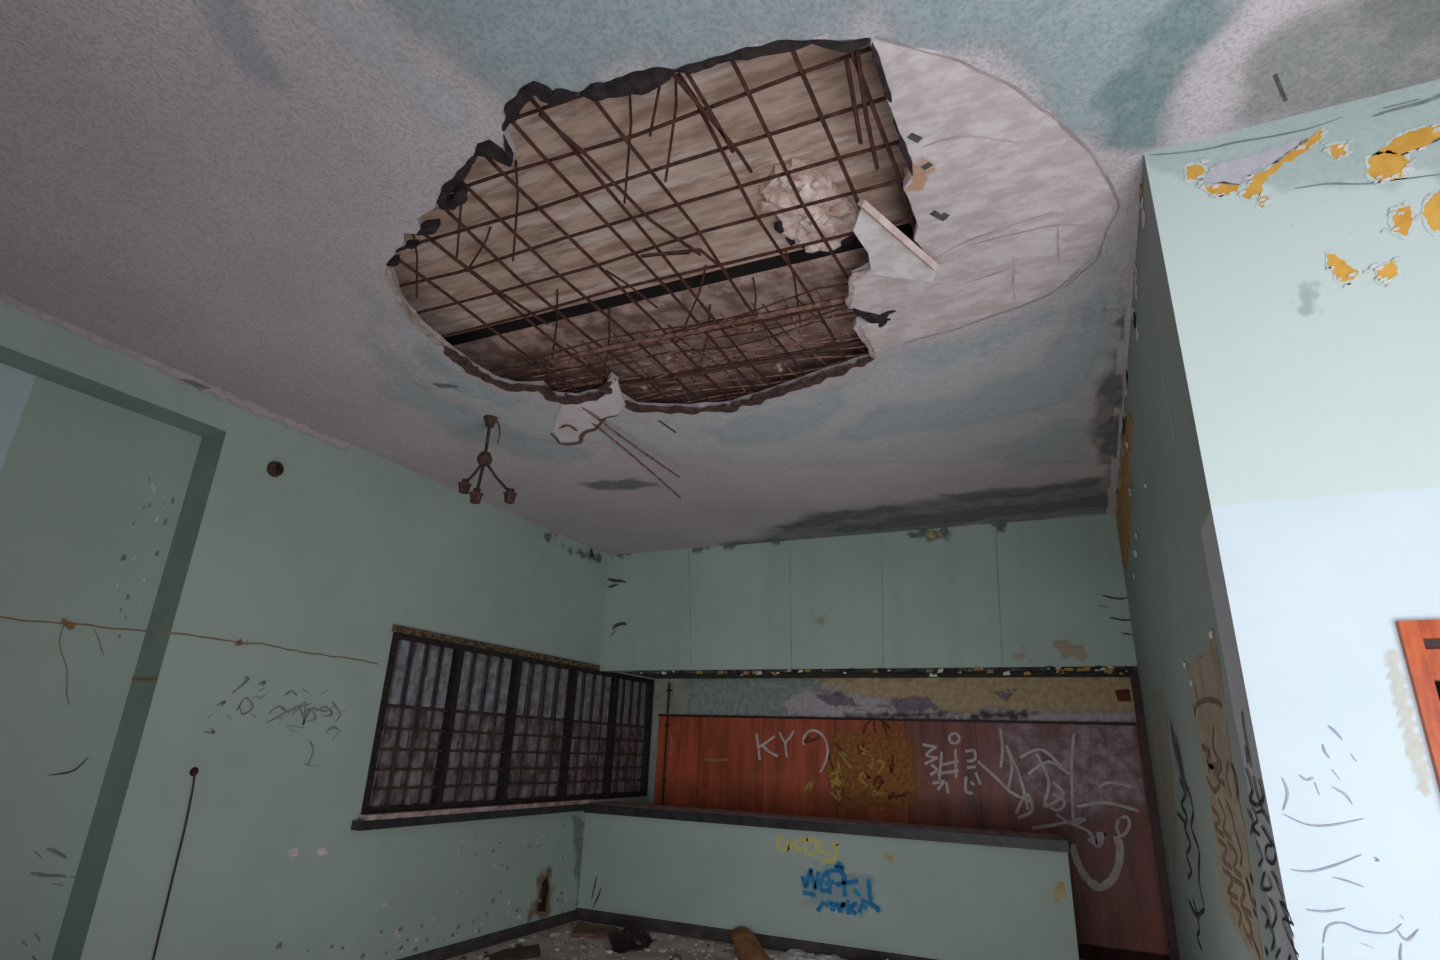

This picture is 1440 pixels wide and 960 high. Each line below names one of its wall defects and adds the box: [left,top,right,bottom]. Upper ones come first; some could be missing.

leakage [1103,0,1211,144]
leakage [1247,0,1440,117]
peeling [1184,124,1440,211]
peeling [1324,189,1440,288]
leakage [398,284,1125,552]
peeling [1116,362,1147,580]
leakage [545,533,632,563]
peeling [633,666,1138,723]
peeling [1183,628,1263,960]